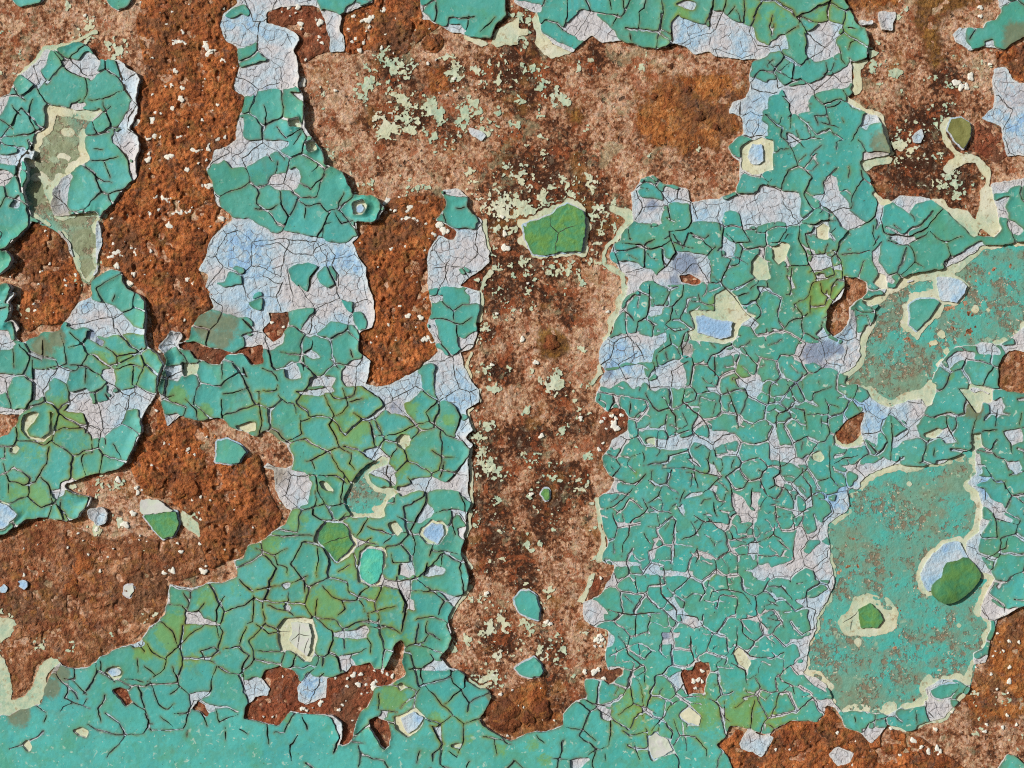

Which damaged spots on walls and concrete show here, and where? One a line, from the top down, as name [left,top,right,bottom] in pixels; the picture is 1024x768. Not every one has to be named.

corrosion [0,398,282,698]
corrosion [100,0,289,365]
peeling [0,0,494,565]
crack [0,0,523,768]
corrosion [244,663,395,748]
corrosion [354,195,456,386]
peeling [0,365,868,768]
peeling [420,0,528,48]
peeling [513,0,1024,743]
crack [541,0,1024,768]
corrosion [720,708,964,768]
corrosion [963,607,1024,727]